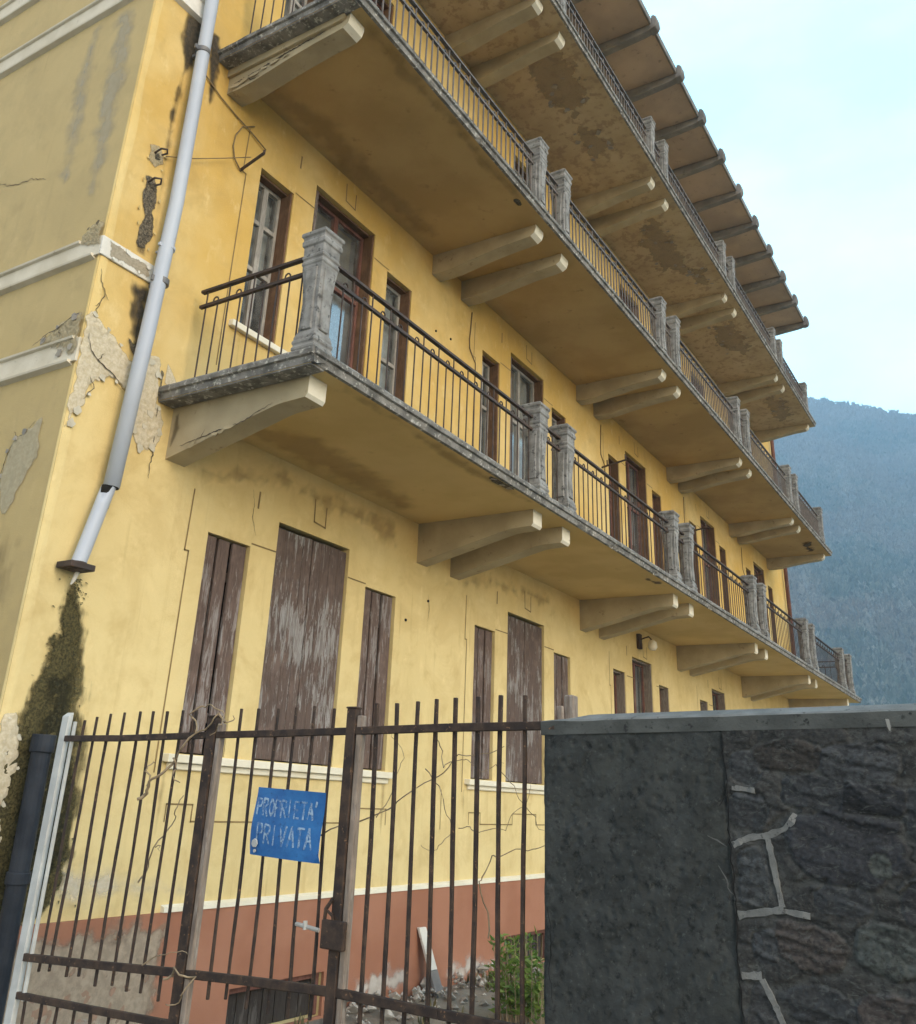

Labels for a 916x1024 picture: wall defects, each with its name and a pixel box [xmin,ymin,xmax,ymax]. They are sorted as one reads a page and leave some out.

damp [183,15,201,70]
damp [209,34,220,101]
spalling [81,144,168,277]
flaking render [0,418,42,513]
spalling [36,311,136,427]
spalling [133,356,164,478]